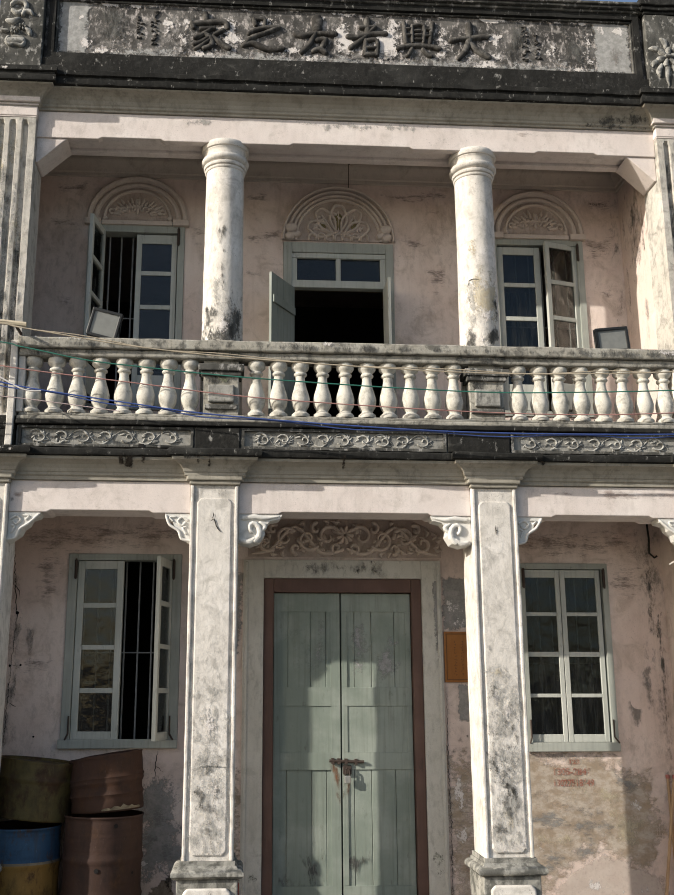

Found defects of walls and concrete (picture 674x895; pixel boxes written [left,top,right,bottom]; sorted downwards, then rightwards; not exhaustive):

peeling [58,2,632,73]
damp [0,141,30,408]
peeling [466,269,499,346]
crack [3,555,20,743]
peeling [432,578,466,648]
peeling [458,684,470,722]
peeling [483,669,668,894]
peeling [433,750,475,895]
spalling [147,875,173,895]